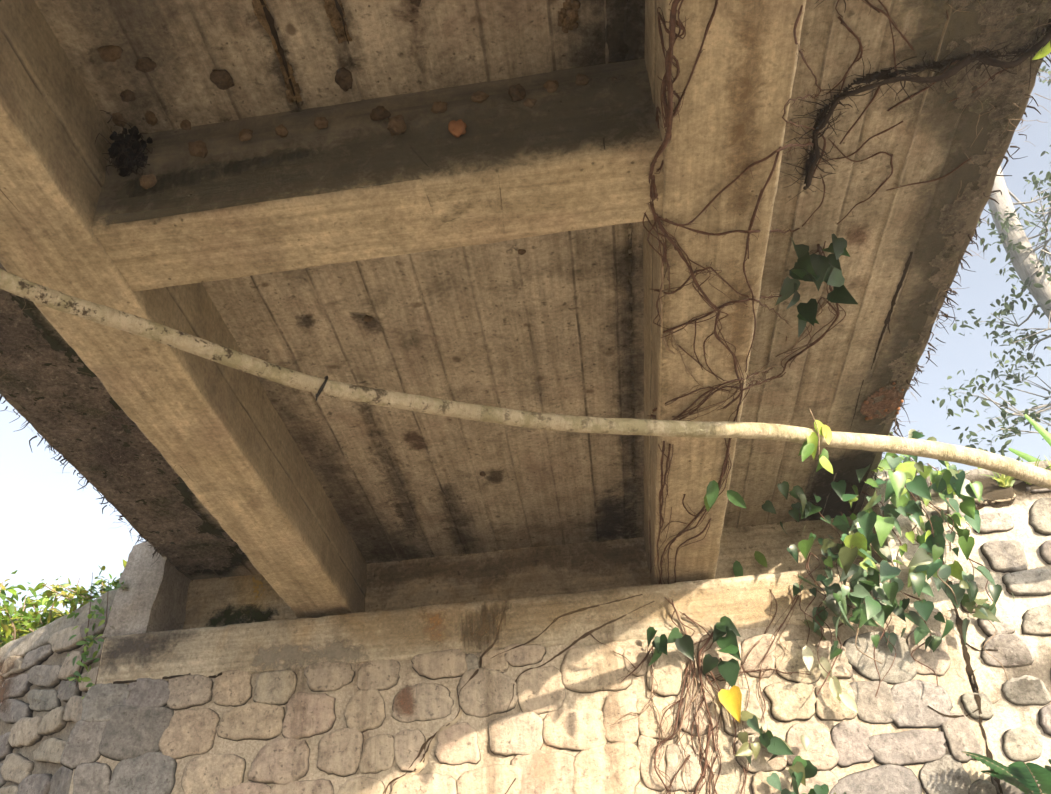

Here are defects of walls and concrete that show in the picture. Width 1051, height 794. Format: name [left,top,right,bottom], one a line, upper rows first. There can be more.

crack [260,0,297,104]
crack [335,0,349,44]
damp [575,0,645,66]
damp [106,76,653,225]
damp [8,293,98,390]
damp [612,249,644,418]
spalling [860,382,904,420]
damp [109,397,249,576]
damp [593,436,643,542]
damp [462,604,507,653]
crack [383,594,655,794]
crack [928,561,1003,794]